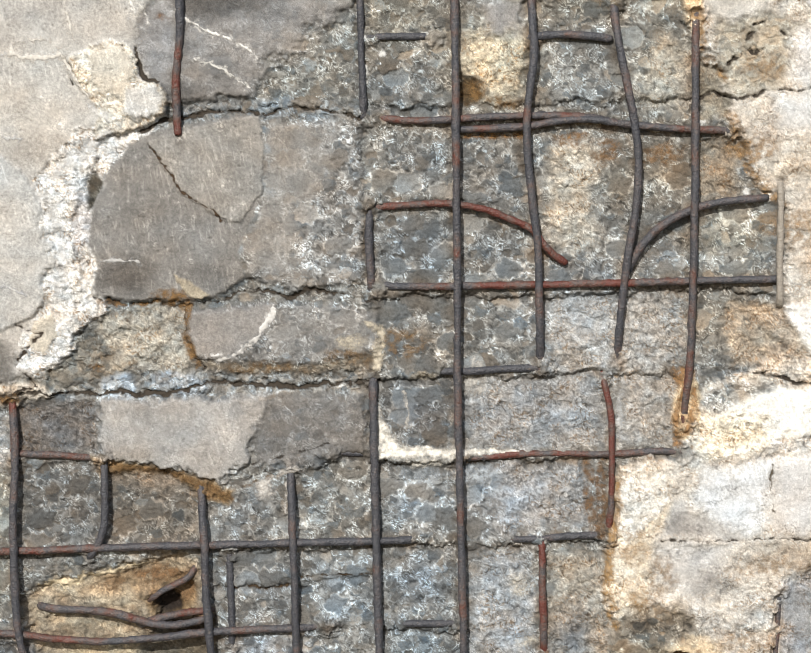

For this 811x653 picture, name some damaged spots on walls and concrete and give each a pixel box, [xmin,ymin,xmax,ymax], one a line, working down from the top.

crack [135,47,159,83]
corrosion [469,83,516,108]
crack [699,88,804,100]
crack [139,57,362,222]
corrosion [734,141,777,200]
crack [0,285,380,400]
spalling [0,0,460,653]
spalling [450,0,811,653]
corrosion [672,367,699,446]
crack [728,367,811,385]
corrosion [148,468,233,500]
corrosion [583,458,622,629]